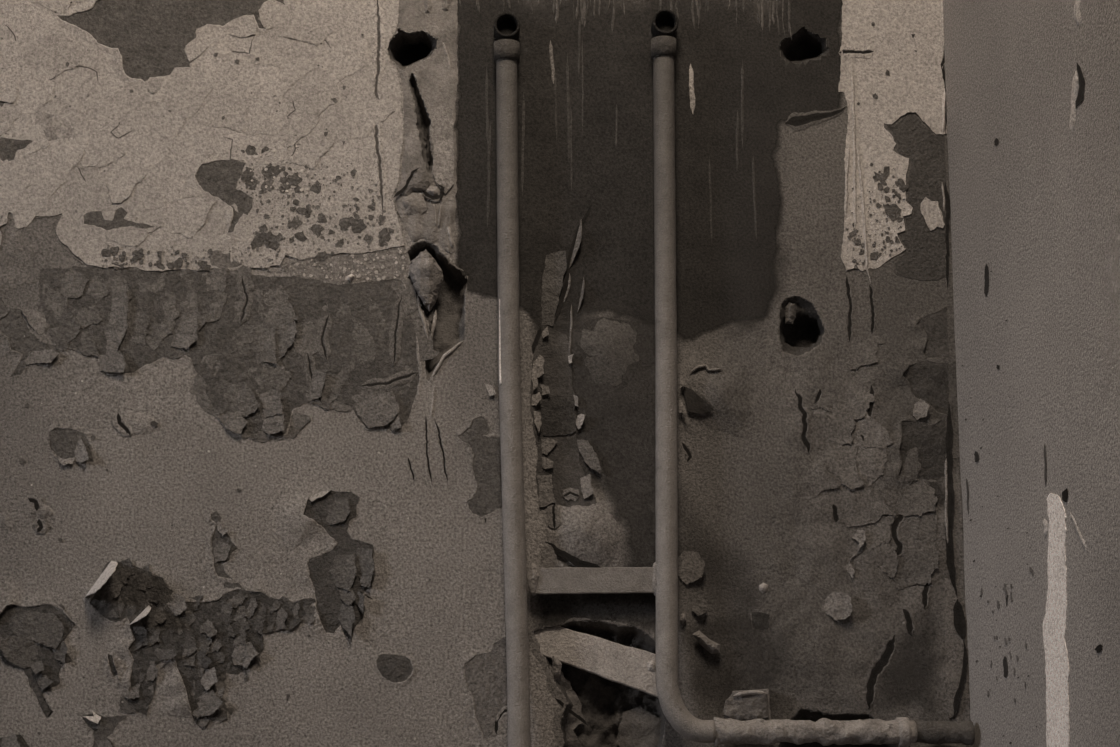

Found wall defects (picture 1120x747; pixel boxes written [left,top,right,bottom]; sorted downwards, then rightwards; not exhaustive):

spalling [779,25,830,68]
crack [0,0,395,269]
peeling [842,115,946,281]
spalling [772,291,829,364]
peeling [453,413,502,523]
peeling [573,395,601,502]
crack [794,389,825,454]
crack [828,504,844,522]
crack [859,385,879,442]
crack [861,401,958,709]
peeling [884,305,967,490]
spalling [528,618,673,747]